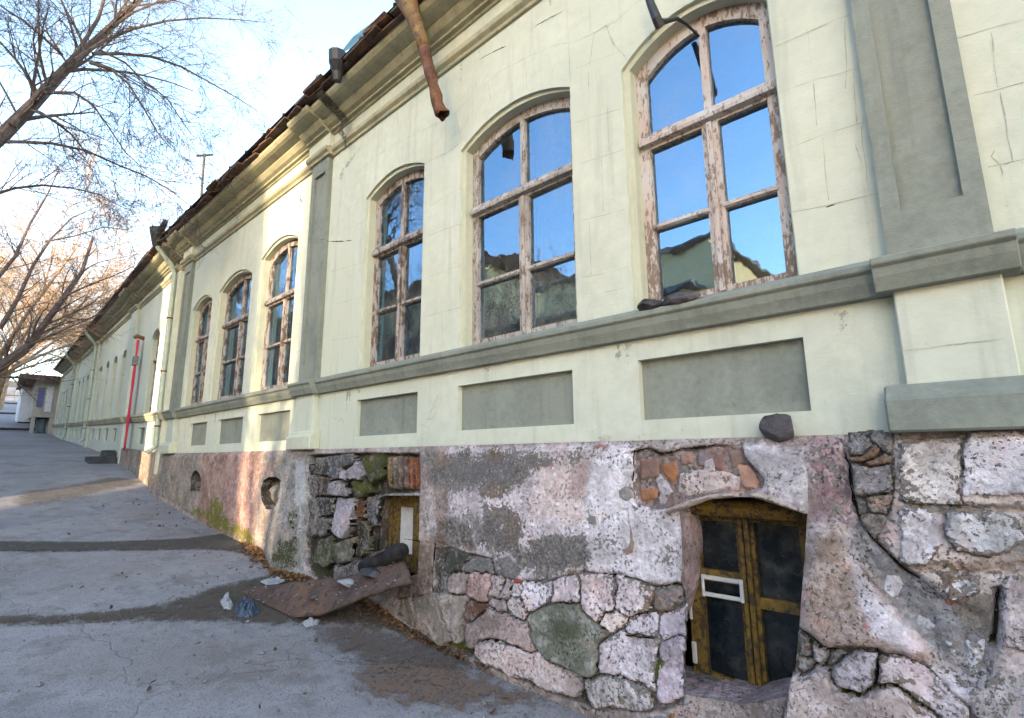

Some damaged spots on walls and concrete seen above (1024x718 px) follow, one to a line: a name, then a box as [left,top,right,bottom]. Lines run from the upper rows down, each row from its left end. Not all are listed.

flaking render [306,453,420,579]
flaking render [619,445,764,509]
flaking render [848,430,896,539]
peeling [885,575,904,597]
flaking render [398,547,689,712]
peeling [917,615,937,630]
peeling [945,638,985,669]